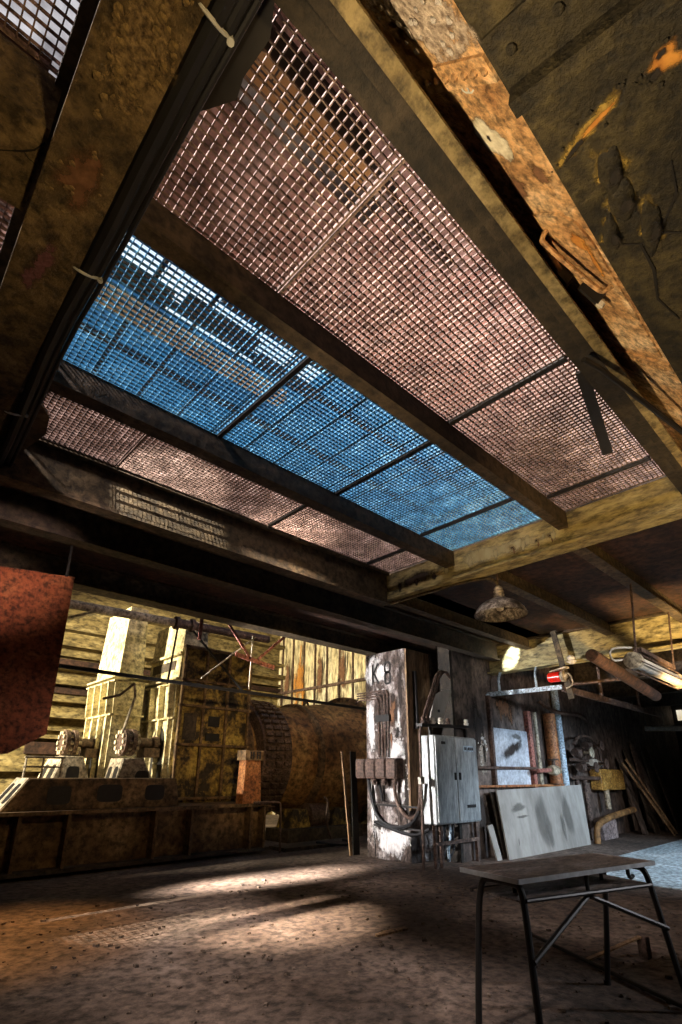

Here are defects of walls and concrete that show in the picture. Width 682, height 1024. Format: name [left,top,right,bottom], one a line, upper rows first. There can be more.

rust [639,33,682,89]
rust [507,163,550,200]